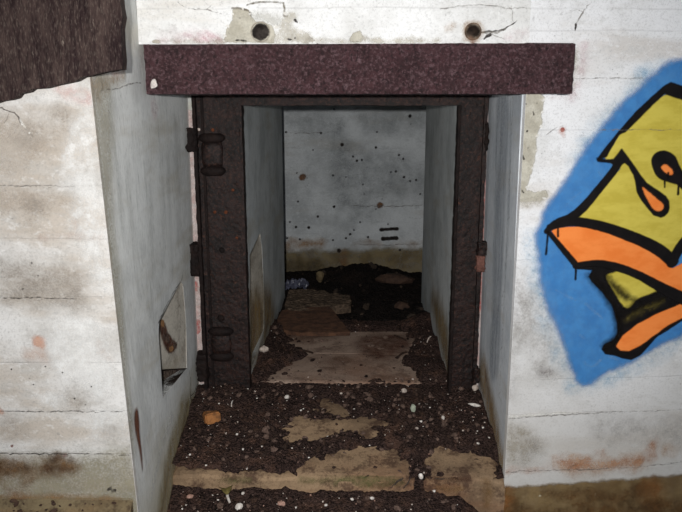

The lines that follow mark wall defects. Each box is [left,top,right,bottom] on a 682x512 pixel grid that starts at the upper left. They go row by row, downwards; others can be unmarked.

peeling [215,1,315,43]
peeling [341,31,382,43]
crack [481,5,515,39]
crack [0,107,33,137]
peeling [520,94,548,206]
rust [160,320,177,353]
rust [134,409,143,469]
water stain [0,454,138,512]
water stain [503,475,682,512]